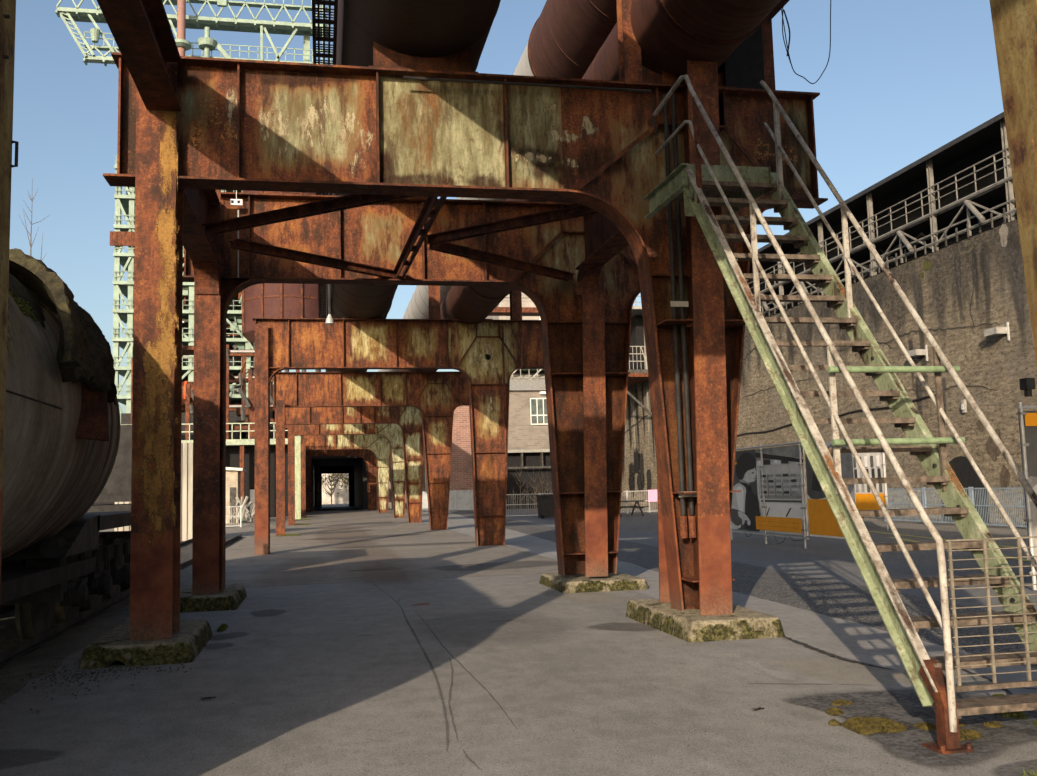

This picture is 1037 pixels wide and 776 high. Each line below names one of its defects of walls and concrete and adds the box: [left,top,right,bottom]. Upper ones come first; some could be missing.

rust [236,71,355,86]
rust [369,88,453,185]
rust [471,176,502,187]
rust [520,148,561,177]
rust [771,115,801,181]
rust [1011,577,1037,622]